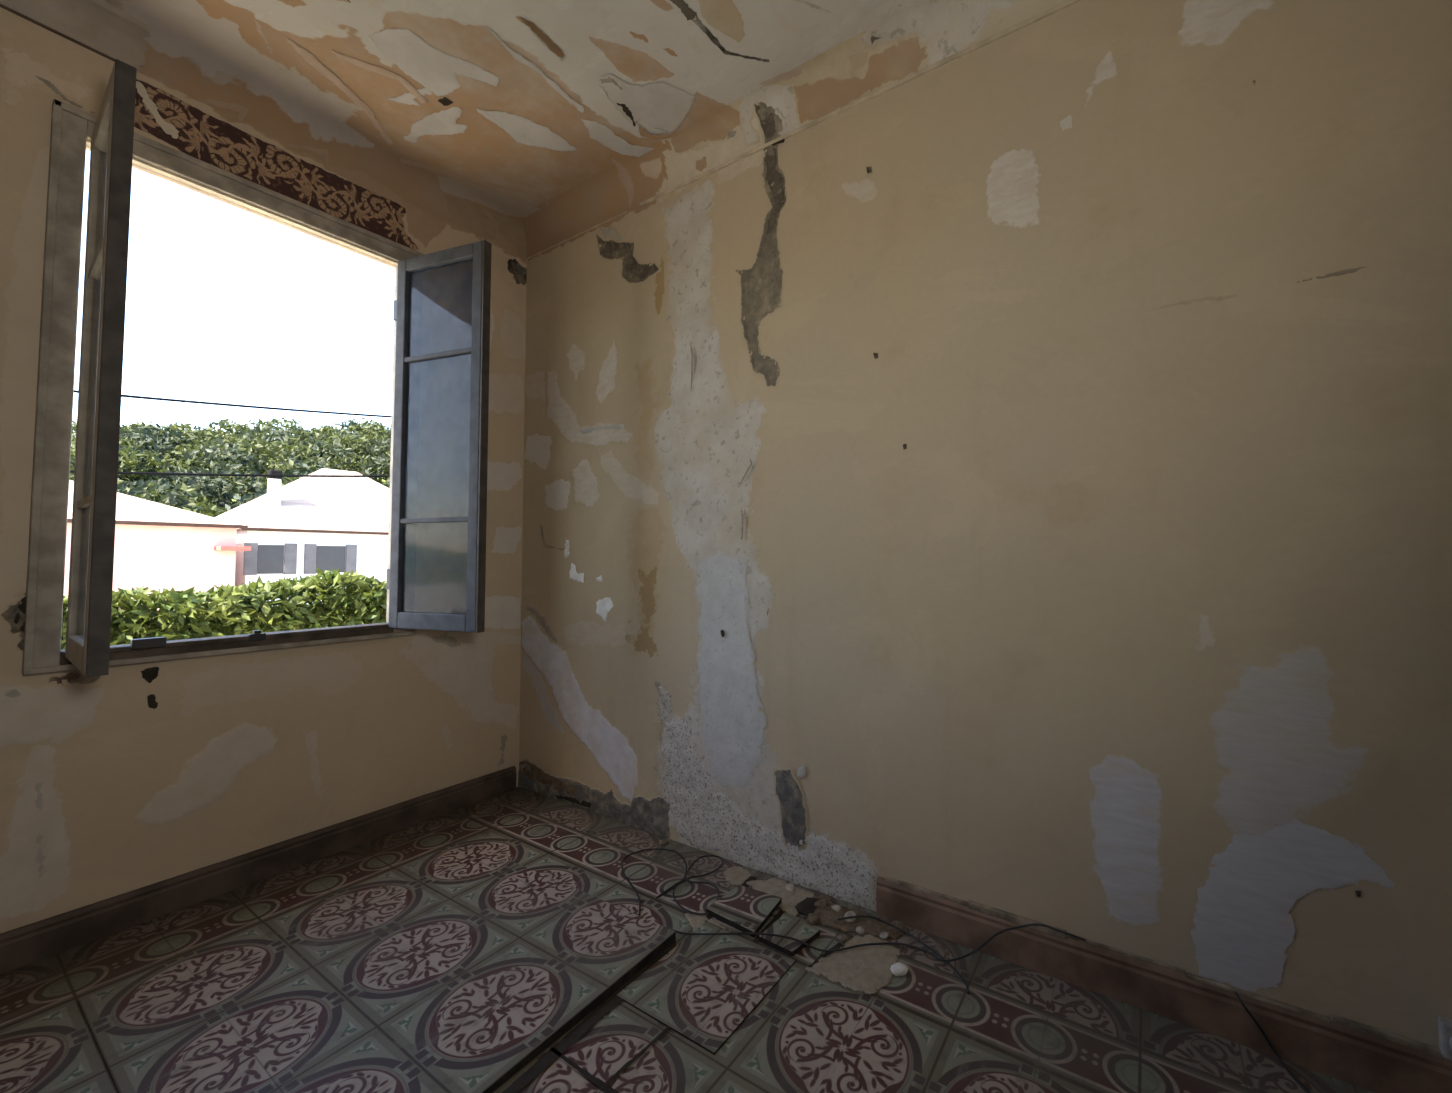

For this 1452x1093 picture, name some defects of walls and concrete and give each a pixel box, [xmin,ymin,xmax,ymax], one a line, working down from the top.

crack [669,0,772,64]
crack [597,74,677,140]
peeling [760,34,928,127]
peeling [118,0,749,287]
crack [594,226,661,285]
crack [735,102,787,389]
crack [688,343,696,389]
spalling [795,897,820,914]